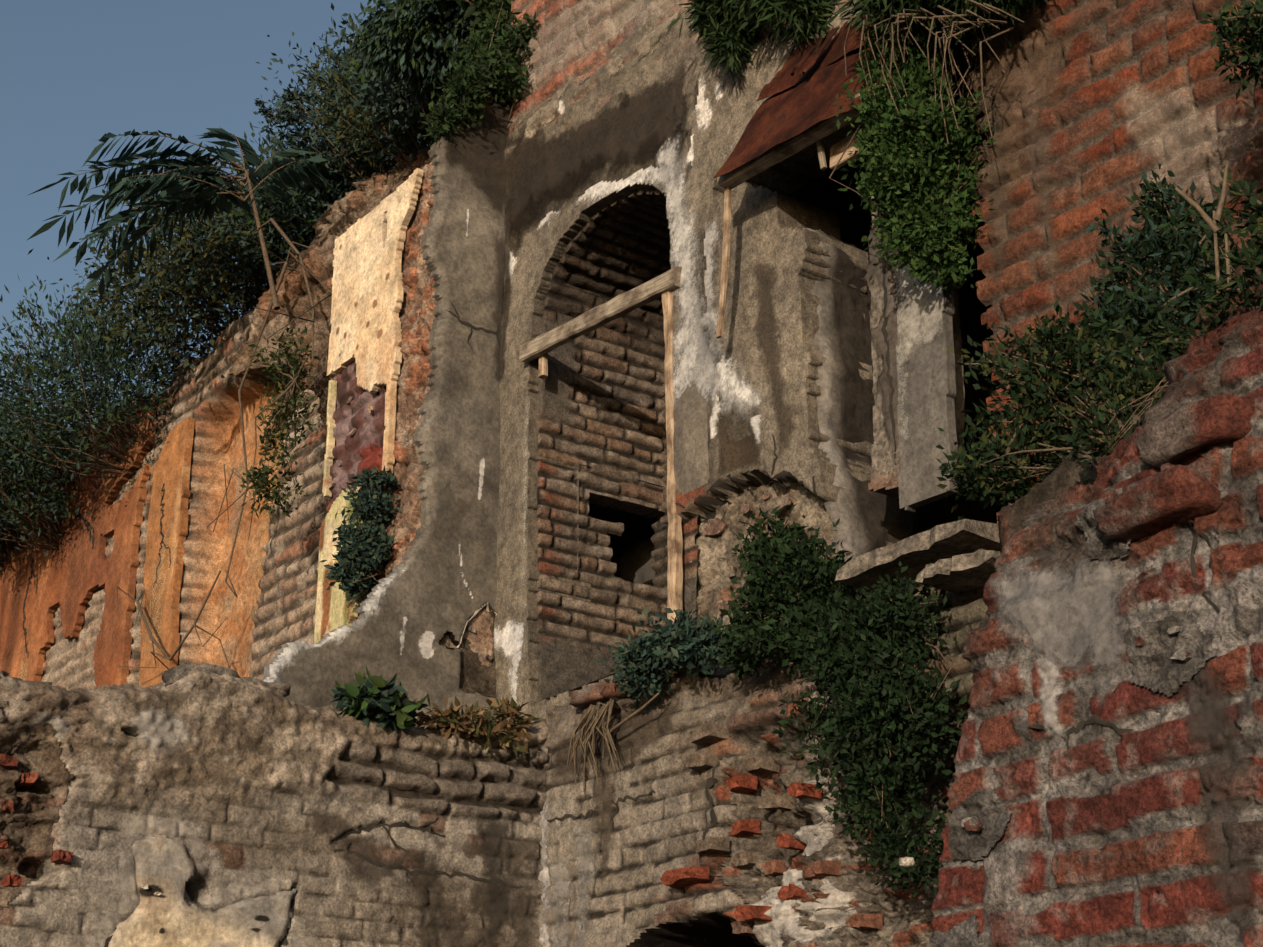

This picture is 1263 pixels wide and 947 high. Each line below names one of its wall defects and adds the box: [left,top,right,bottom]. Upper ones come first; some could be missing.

leakage [522,0,679,85]
leakage [445,65,792,474]
crack [447,301,499,352]
spalling [42,589,105,691]
spalling [0,722,74,909]
peeling [108,835,296,947]
crack [333,817,523,888]
spalling [660,714,1012,947]